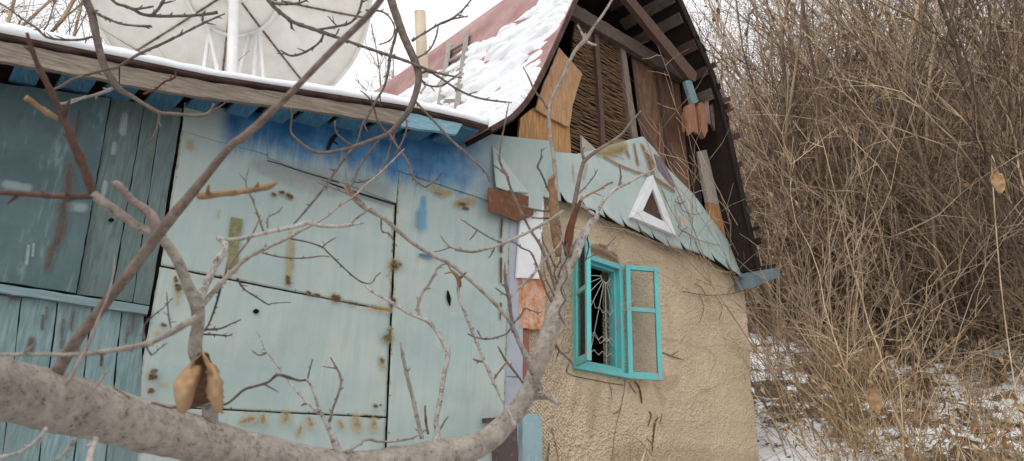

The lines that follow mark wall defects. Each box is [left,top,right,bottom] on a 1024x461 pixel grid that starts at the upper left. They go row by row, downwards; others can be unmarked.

rust [282,411,314,437]
rust [338,404,382,430]